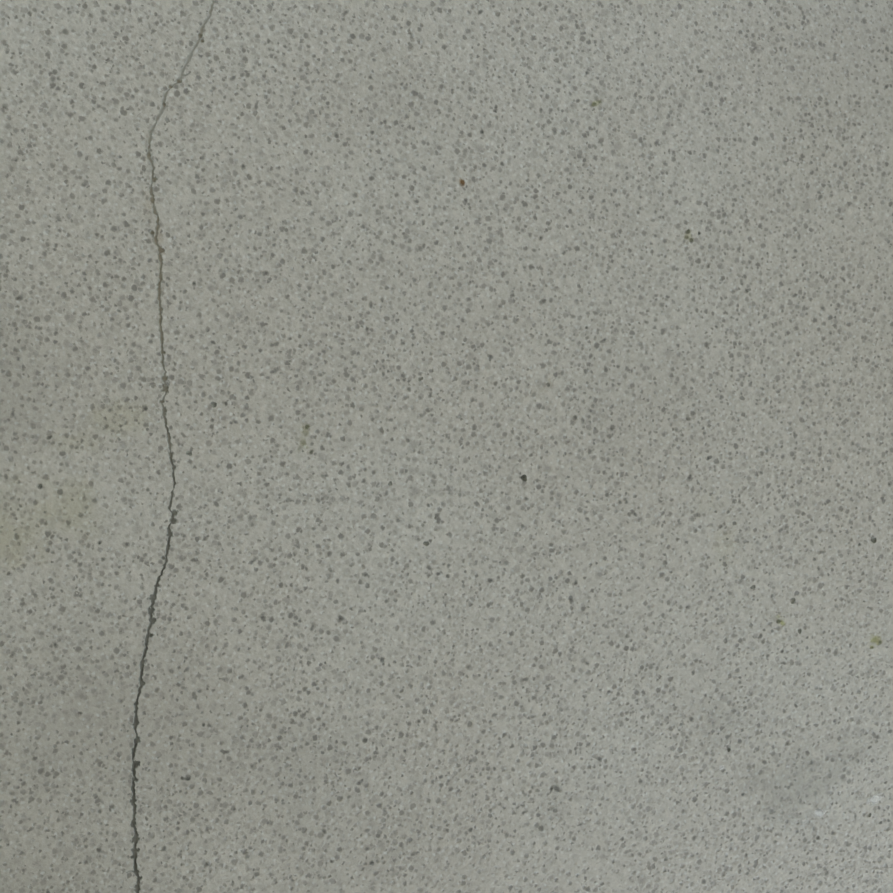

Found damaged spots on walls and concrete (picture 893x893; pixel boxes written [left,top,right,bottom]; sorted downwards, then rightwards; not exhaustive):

crack [125,0,215,893]